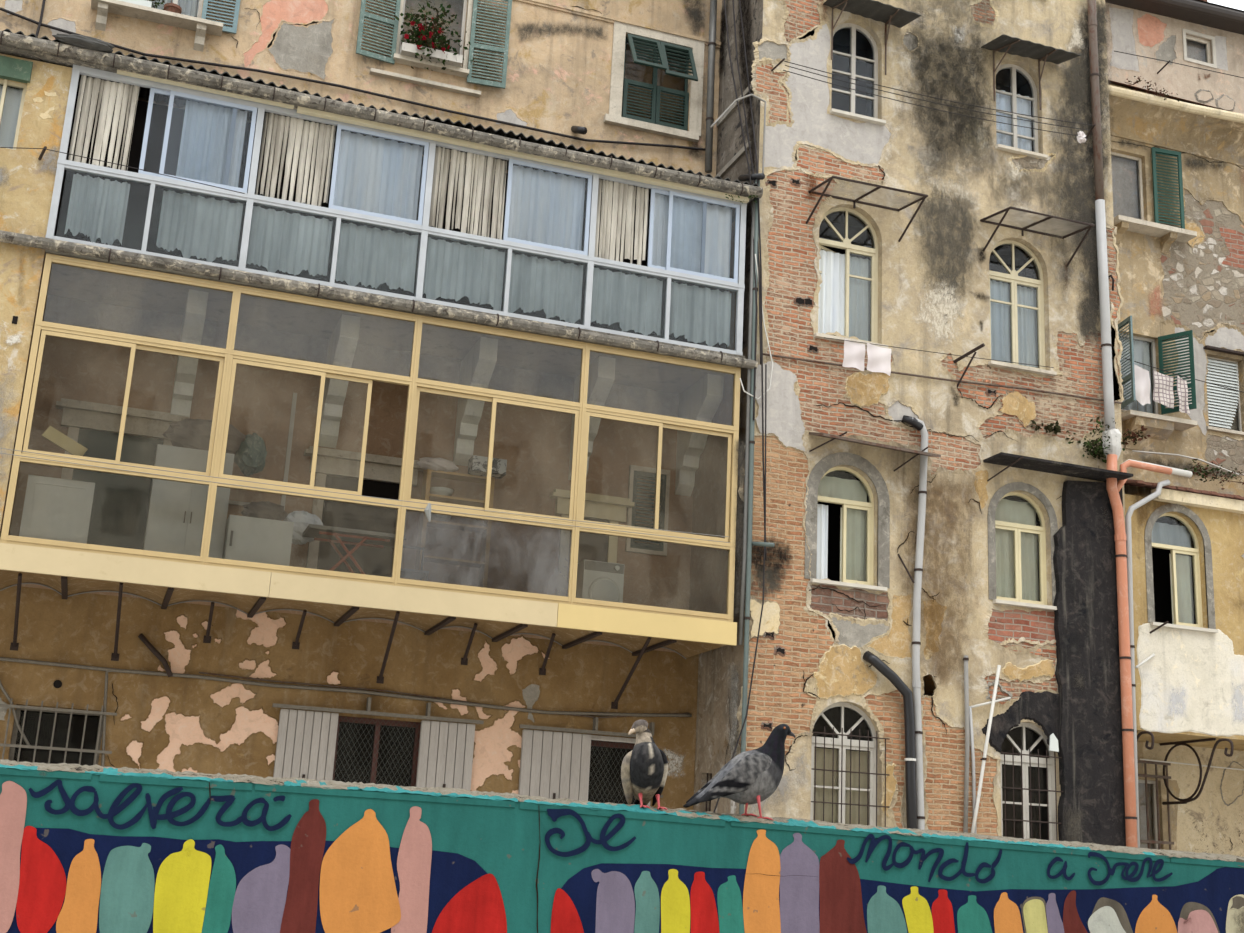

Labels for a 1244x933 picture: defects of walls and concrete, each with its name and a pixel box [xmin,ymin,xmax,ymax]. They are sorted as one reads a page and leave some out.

peeling [241,0,330,68]
flaking render [751,57,795,127]
water stain [912,34,986,155]
water stain [1054,4,1107,338]
water stain [919,192,976,299]
flaking render [1185,222,1244,271]
flaking render [737,141,1124,762]
peeling [119,607,288,773]
peeling [325,670,342,686]
peeling [432,635,552,794]
crack [785,735,807,771]